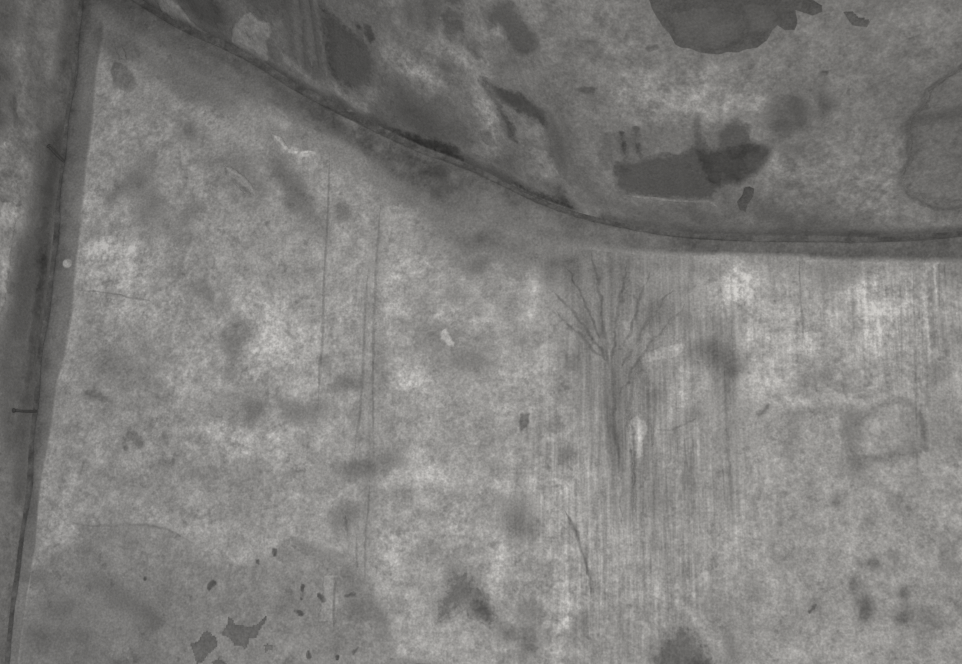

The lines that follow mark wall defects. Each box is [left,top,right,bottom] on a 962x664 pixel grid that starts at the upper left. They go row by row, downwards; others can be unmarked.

crack [132,0,962,242]
crack [5,0,83,664]
crack [318,153,330,404]
crack [797,265,805,352]